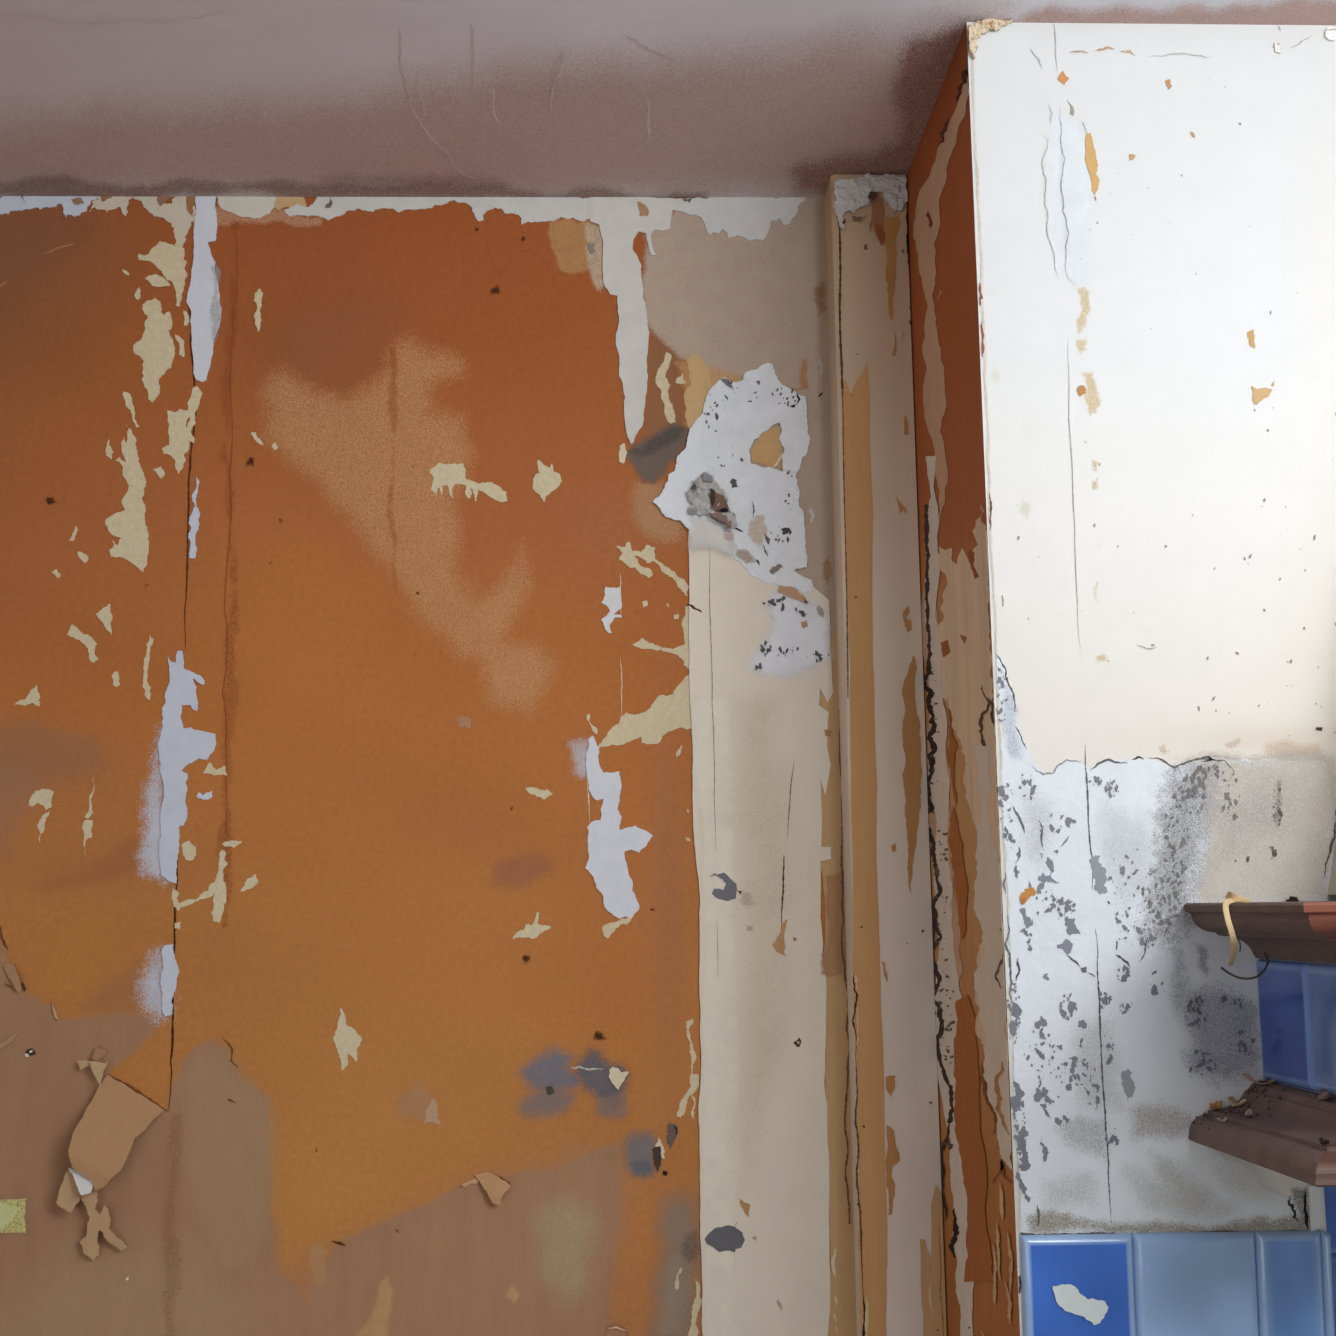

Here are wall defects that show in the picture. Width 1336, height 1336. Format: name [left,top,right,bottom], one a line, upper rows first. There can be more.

damp [0,0,1336,337]
crack [1041,107,1087,285]
peeling [105,391,165,572]
crack [184,220,241,928]
damp [627,478,688,549]
damp [637,327,686,440]
flaking render [653,18,1336,1336]
crack [171,859,179,955]
peeling [158,651,242,1016]
peeling [585,736,653,919]
damp [1092,738,1325,1091]
peeling [56,1047,164,1260]